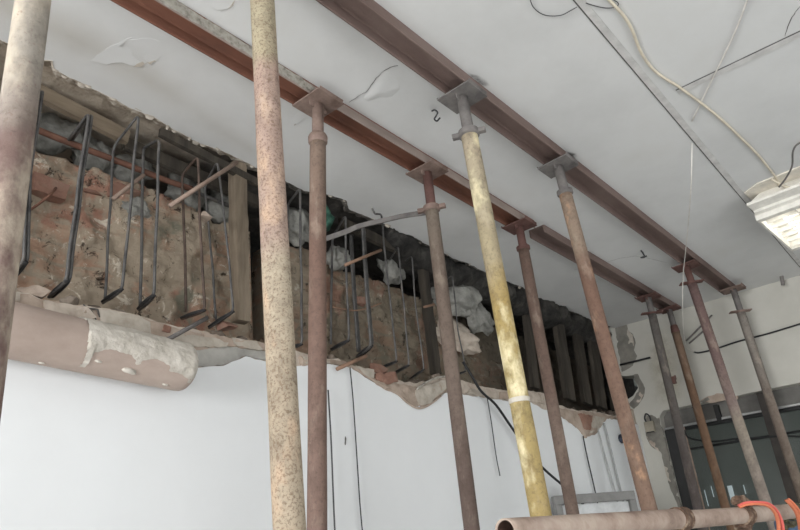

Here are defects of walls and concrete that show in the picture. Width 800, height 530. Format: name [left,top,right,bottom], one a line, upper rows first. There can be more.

peeling [91,37,166,67]
flaking render [15,60,266,367]
spalling [285,181,309,366]
peeling [326,194,447,409]
flaking render [447,275,509,400]
peeling [560,351,617,438]
flaking render [615,325,645,409]
flaking render [645,415,682,507]